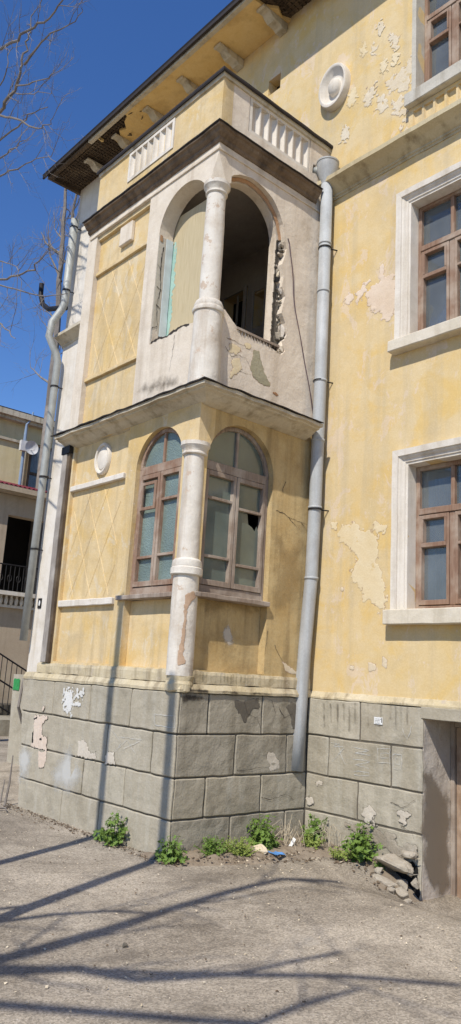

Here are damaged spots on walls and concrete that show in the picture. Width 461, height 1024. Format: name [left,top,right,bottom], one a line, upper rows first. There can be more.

flaking render [347,18,412,133]
spalling [231,177,285,354]
peeling [343,263,395,322]
flaking render [229,338,278,396]
peeling [330,520,388,614]
peeling [177,591,196,665]
peeling [61,687,84,718]
spalling [31,706,48,769]
spalling [75,740,115,765]
spalling [266,752,280,771]
spalling [344,804,420,899]